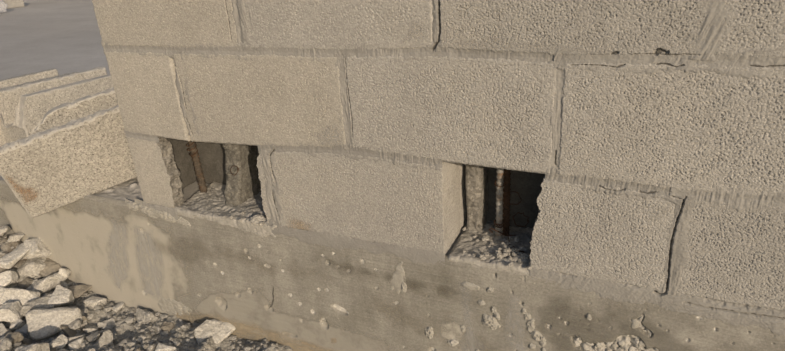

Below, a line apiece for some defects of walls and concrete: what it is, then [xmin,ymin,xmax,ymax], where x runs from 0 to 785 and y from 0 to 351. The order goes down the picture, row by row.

crack [645,53,692,67]
spalling [125,137,277,248]
spalling [447,164,540,281]